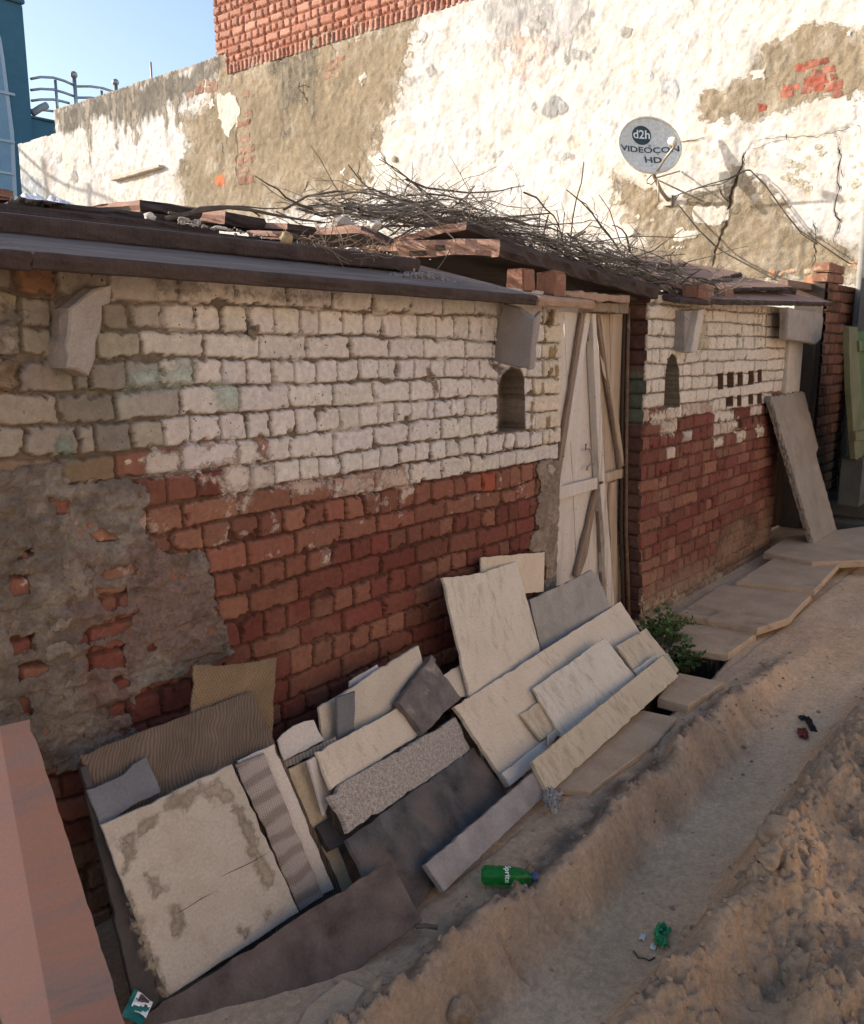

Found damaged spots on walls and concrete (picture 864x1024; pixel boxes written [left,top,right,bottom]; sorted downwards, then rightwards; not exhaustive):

flaking render [172,2,423,223]
flaking render [607,144,858,287]
flaking render [698,20,864,127]
crack [712,113,859,267]
peeling [832,133,864,201]
flaking render [0,433,417,775]